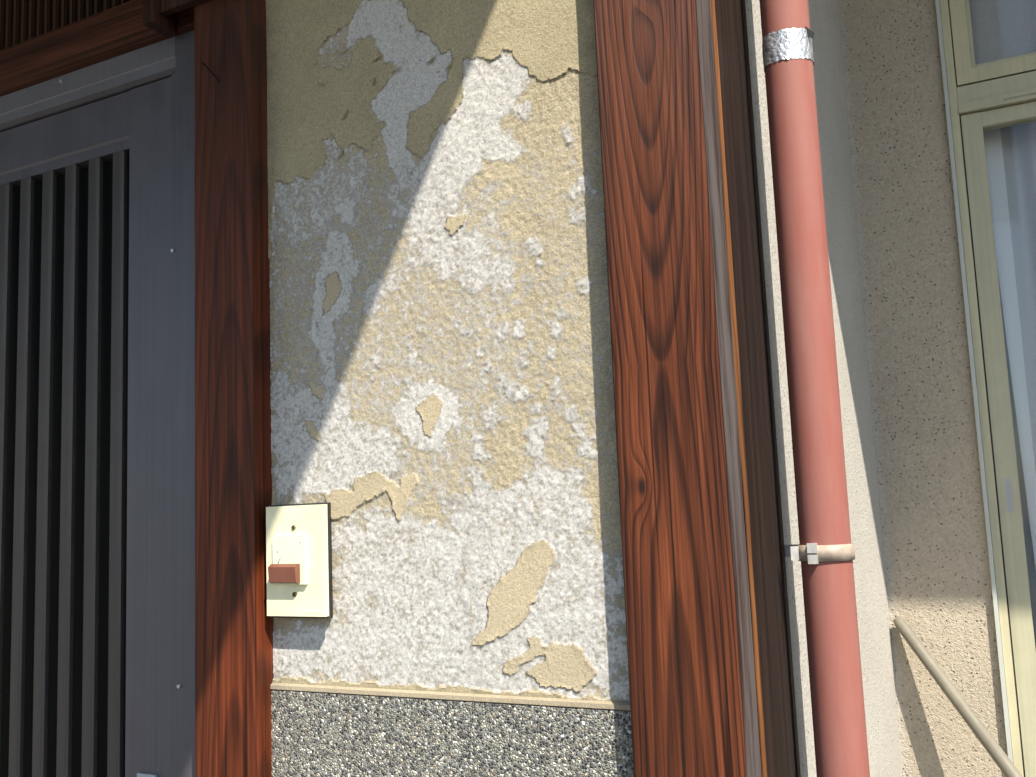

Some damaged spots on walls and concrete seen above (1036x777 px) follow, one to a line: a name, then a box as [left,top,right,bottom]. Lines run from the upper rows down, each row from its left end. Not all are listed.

peeling [269,0,630,702]